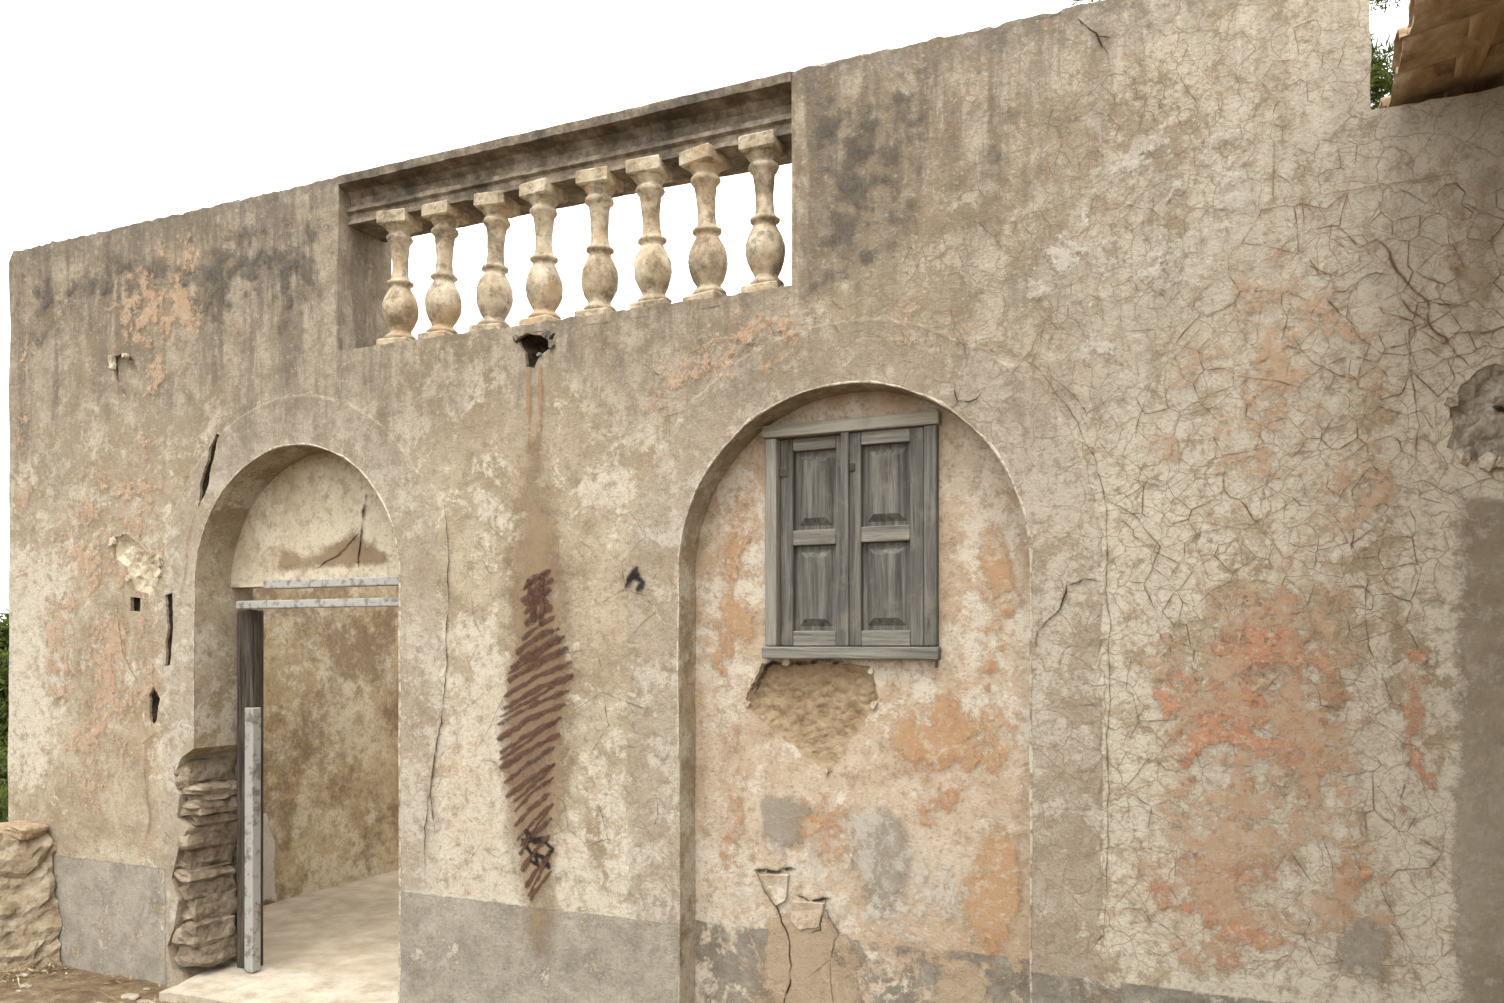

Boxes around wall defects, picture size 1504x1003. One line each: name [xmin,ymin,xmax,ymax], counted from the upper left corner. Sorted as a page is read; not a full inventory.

leakage [20,218,317,399]
spalling [1443,364,1504,473]
crack [644,17,1504,966]
leakage [46,438,163,810]
spalling [109,534,163,596]
spalling [744,659,879,774]
crack [755,867,838,1003]